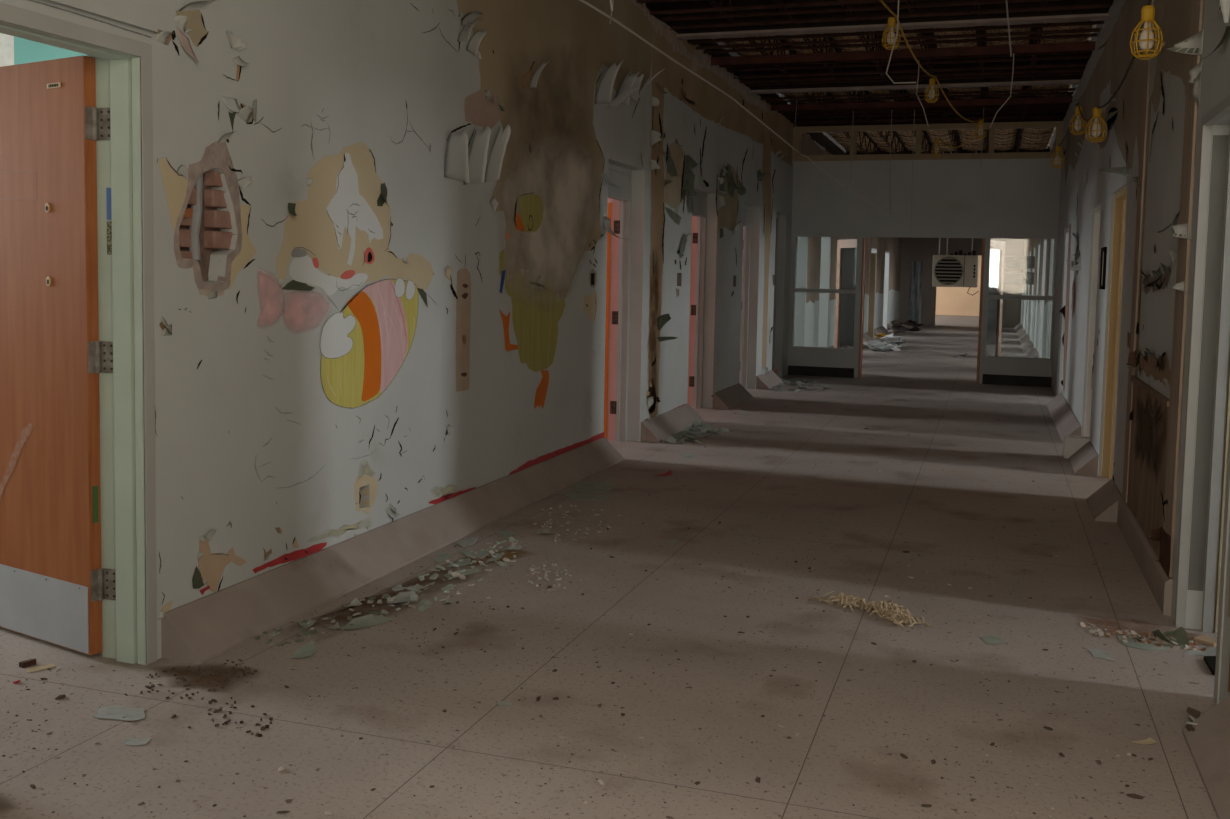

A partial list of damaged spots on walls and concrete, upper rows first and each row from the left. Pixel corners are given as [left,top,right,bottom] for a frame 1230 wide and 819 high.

peeling [154,0,216,63]
peeling [222,56,250,82]
peeling [157,96,434,299]
flaking render [444,0,831,418]
flaking render [806,237,902,303]
flaking render [1022,0,1230,479]
spalling [159,316,172,336]
peeling [192,529,246,595]
peeling [1152,626,1216,656]